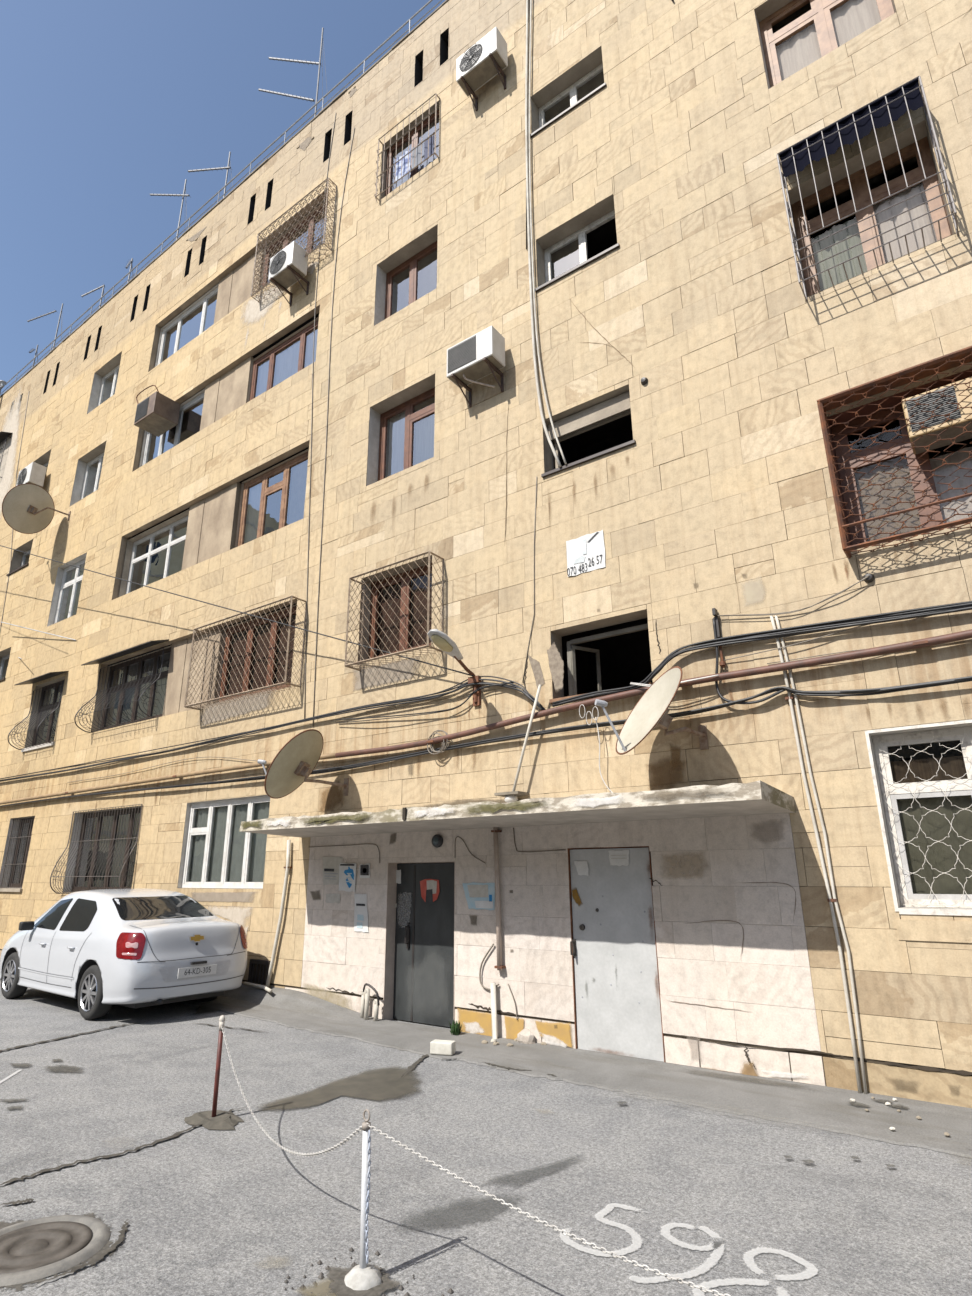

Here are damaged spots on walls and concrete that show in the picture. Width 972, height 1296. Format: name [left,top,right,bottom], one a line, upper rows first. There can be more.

flaking render [457,1008,572,1047]